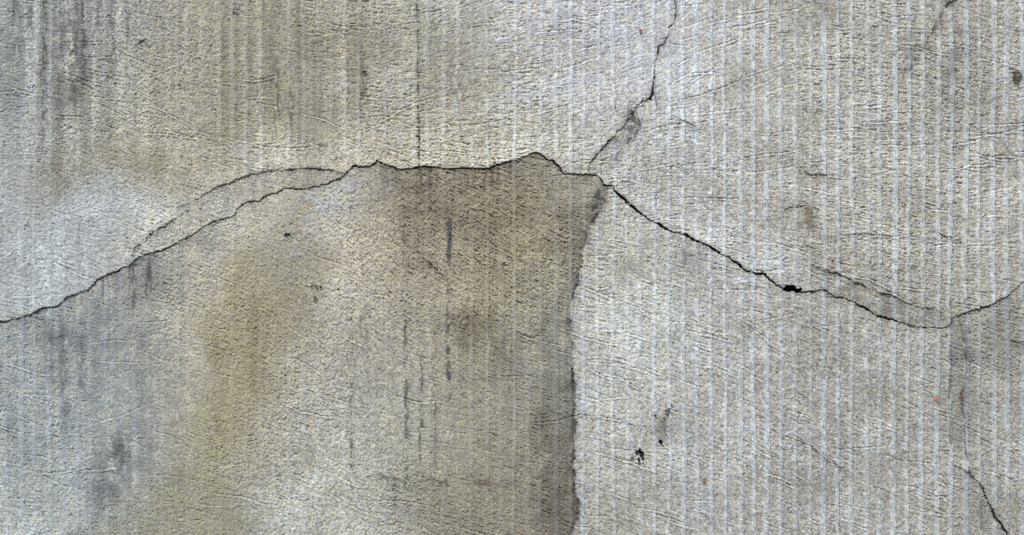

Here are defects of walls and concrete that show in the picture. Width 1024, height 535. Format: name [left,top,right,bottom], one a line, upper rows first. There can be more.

damp [389,155,536,287]
crack [218,6,927,328]
crack [964,441,1008,535]